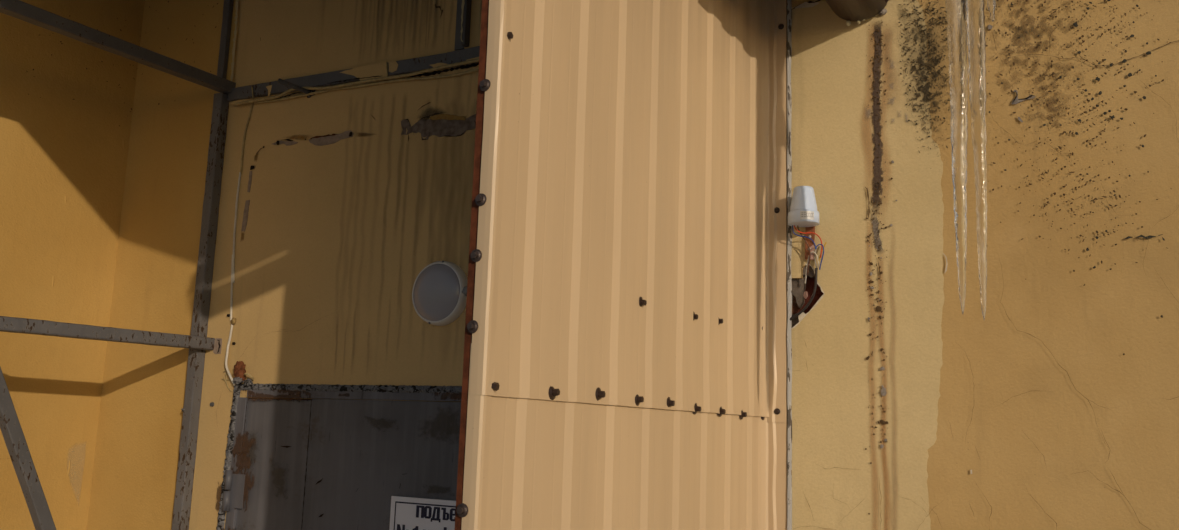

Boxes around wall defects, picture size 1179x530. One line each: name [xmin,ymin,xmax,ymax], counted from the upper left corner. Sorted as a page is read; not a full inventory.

spalling [401,102,476,140]
water stain [898,0,951,153]
water stain [984,0,1171,272]
corrosion [865,20,897,464]
corrosion [245,388,311,402]
corrosion [215,432,256,512]